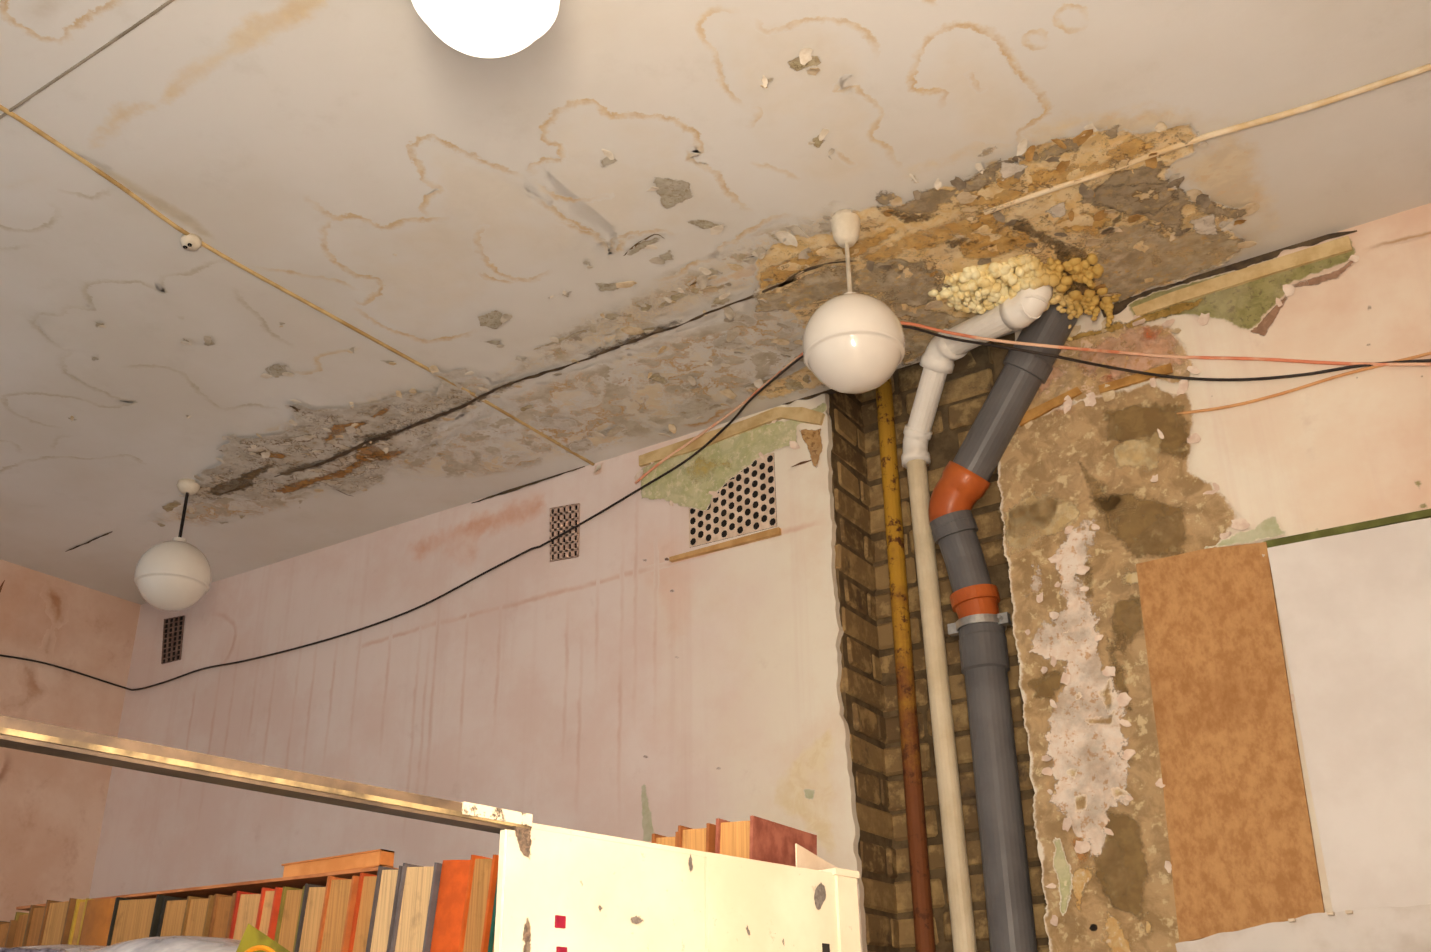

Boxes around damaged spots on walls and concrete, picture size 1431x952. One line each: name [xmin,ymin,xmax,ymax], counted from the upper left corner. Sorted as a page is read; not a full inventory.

damp [0,0,134,46]
damp [85,0,331,151]
peeling [787,48,822,76]
damp [251,98,754,344]
damp [392,3,1284,484]
damp [0,258,227,474]
crack [198,260,853,496]
damp [355,518,825,653]
spalling [147,122,1431,952]